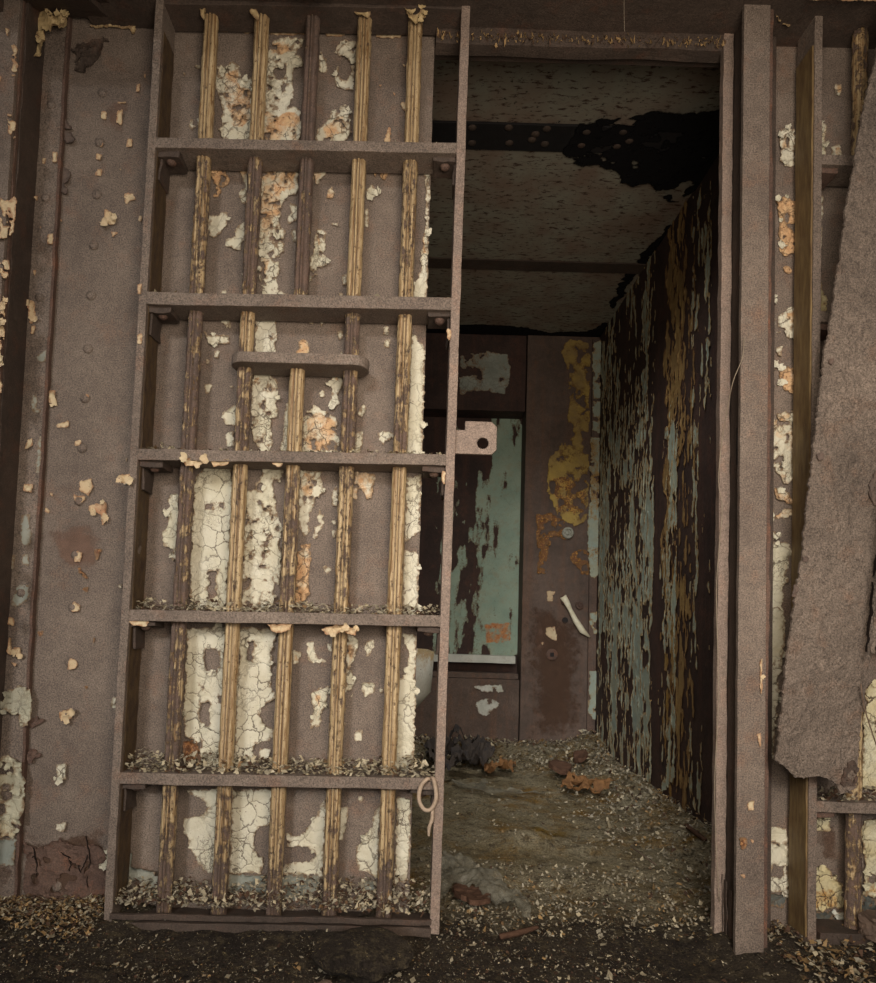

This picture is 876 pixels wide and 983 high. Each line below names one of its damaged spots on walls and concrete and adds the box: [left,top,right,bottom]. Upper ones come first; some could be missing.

peeling [0,28,19,82]
peeling [215,61,252,139]
peeling [264,32,304,140]
peeling [318,33,357,90]
peeling [775,194,795,274]
peeling [774,306,794,394]
rust [774,48,876,794]
peeling [0,102,739,983]
peeling [862,679,876,792]
rust [23,837,107,902]